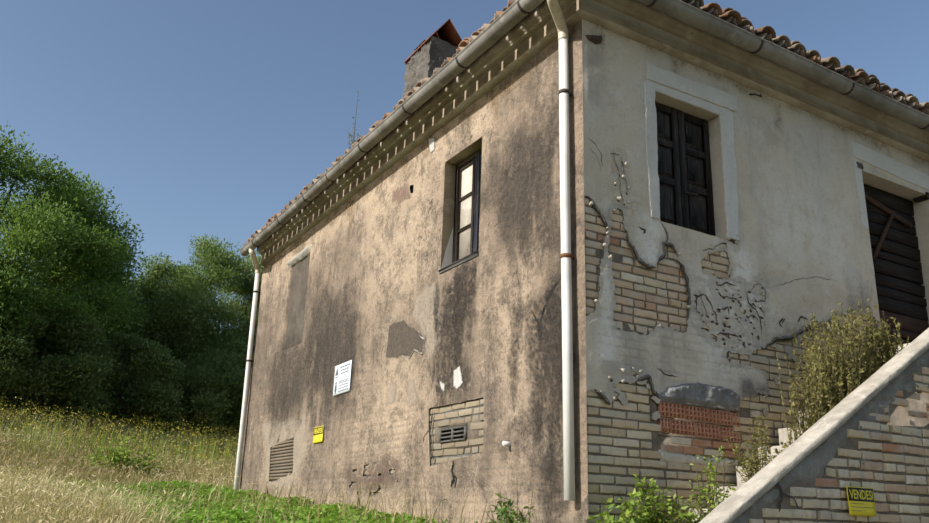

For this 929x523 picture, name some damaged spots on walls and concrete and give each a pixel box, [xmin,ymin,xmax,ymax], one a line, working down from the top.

damp [484,104,559,267]
damp [268,285,360,429]
flaking render [386,283,443,359]
crack [423,412,457,488]
damp [432,261,476,402]
damp [508,275,564,523]
flaking render [581,161,878,523]
spalling [908,411,927,427]